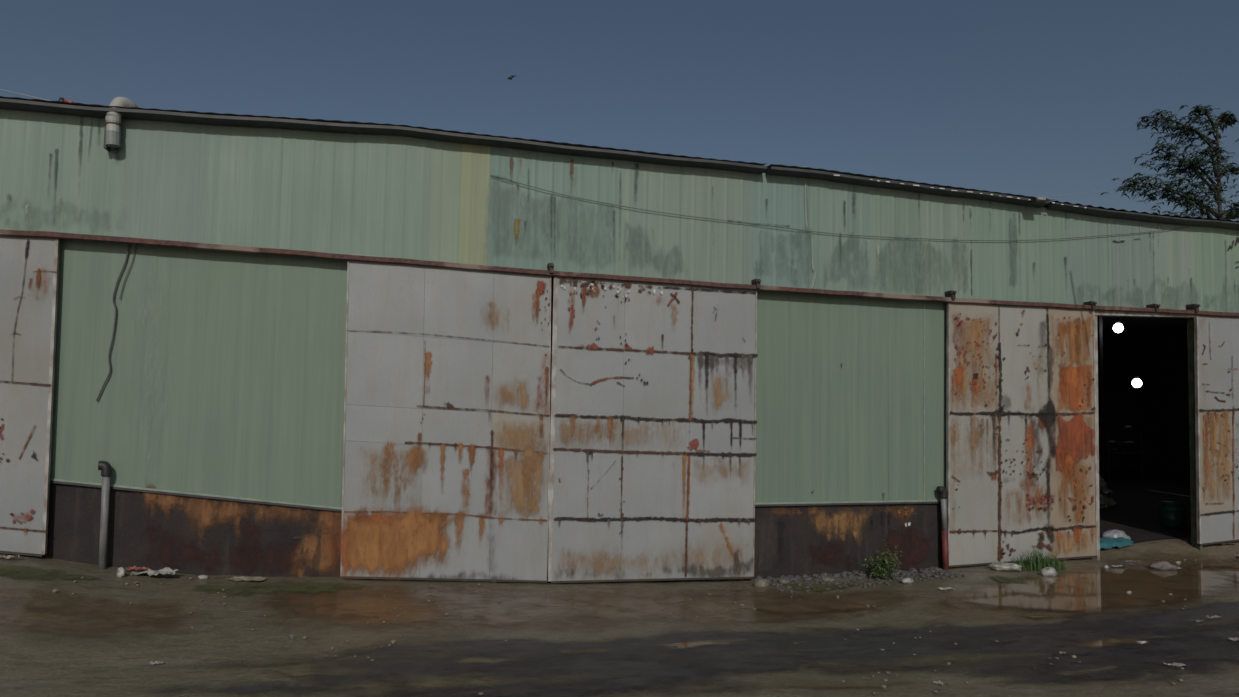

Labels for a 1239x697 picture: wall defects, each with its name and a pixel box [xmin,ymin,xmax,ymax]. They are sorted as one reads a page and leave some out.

rust [143,486,302,526]
rust [292,286,758,578]
rust [782,508,911,540]
rust [950,306,1096,562]
rust [1199,356,1239,539]